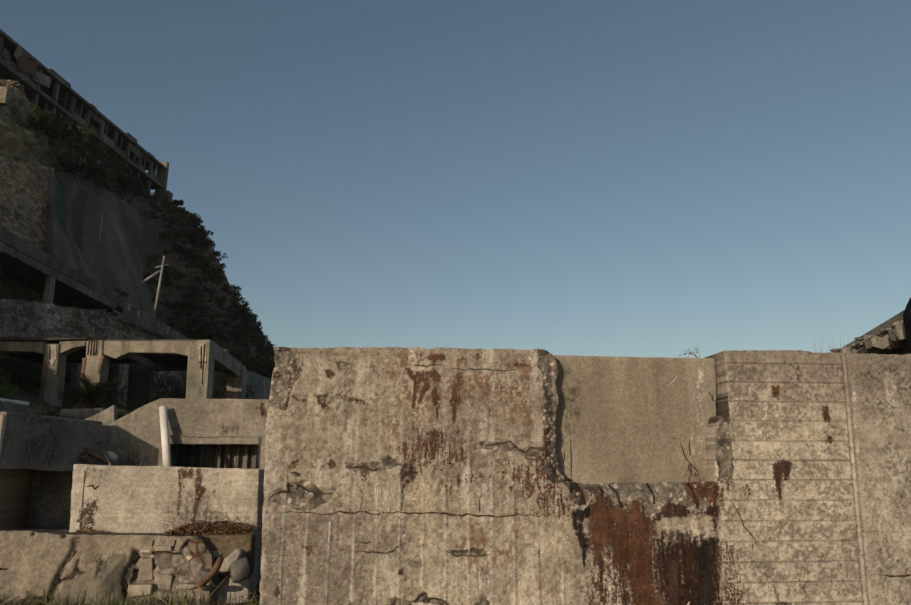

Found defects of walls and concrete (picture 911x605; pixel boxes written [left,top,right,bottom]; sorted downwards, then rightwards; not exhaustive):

spalling [269,347,304,410]
spalling [479,349,734,517]
corrosion [177,468,206,523]
spalling [272,472,332,511]
crack [269,466,567,517]
crack [482,439,572,484]
corrosion [398,354,753,605]
corrosion [773,460,792,499]
crack [25,470,99,603]
spalling [123,537,212,605]
crack [356,541,404,554]
spalling [387,595,446,605]